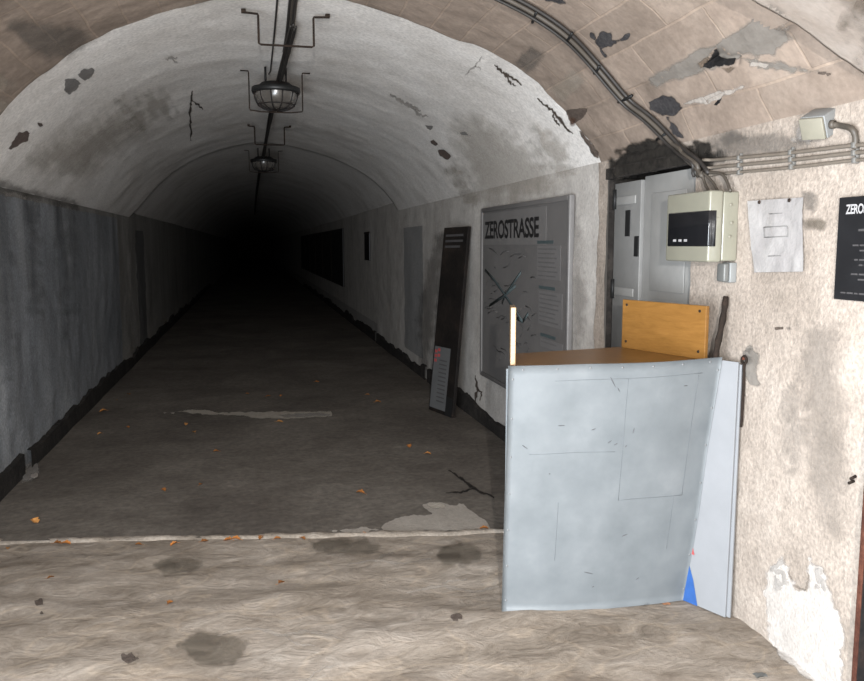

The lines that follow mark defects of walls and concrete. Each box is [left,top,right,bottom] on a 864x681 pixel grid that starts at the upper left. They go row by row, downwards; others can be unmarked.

spalling [698,49,736,73]
peeling [64,68,94,94]
crack [188,91,203,141]
crack [446,470,494,498]
spalling [332,502,490,532]
flaking render [763,557,844,681]